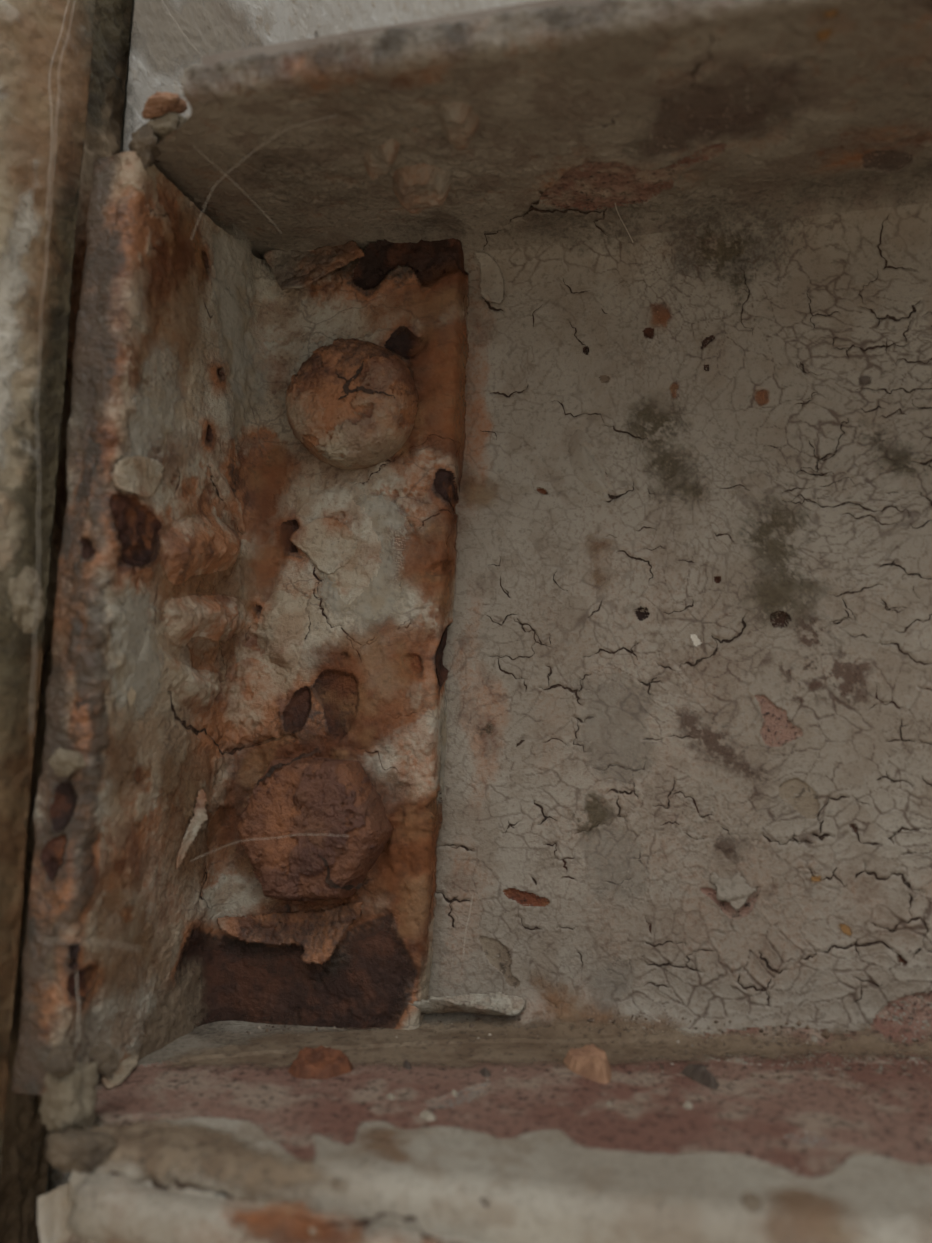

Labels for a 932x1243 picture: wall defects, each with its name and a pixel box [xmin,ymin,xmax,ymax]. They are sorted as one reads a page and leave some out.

corrosion [66,232,88,380]
corrosion [391,270,469,491]
crack [782,214,932,529]
corrosion [394,511,458,612]
corrosion [318,623,425,747]
crack [487,557,748,885]
crack [738,561,932,1005]
corrosion [378,791,441,955]
crack [436,892,469,928]
crack [642,918,711,987]
peeling [95,991,932,1178]
corrosion [240,1203,361,1243]